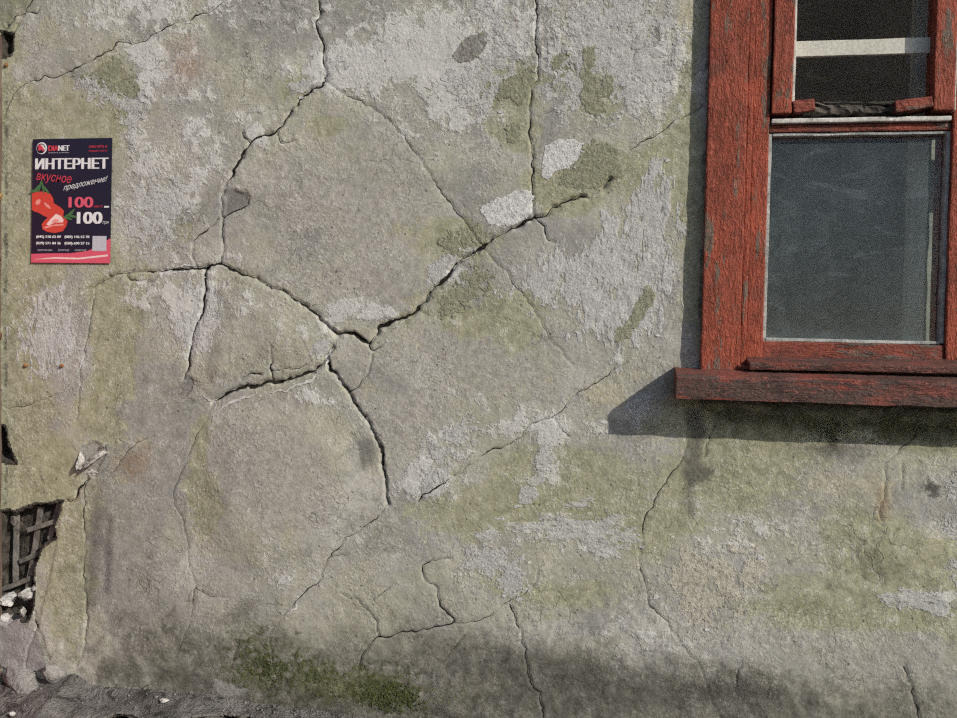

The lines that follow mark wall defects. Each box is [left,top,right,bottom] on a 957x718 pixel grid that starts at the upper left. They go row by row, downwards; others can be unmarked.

crack [4,0,624,688]
flaking render [76,442,108,476]
water stain [758,413,957,453]
flaking render [0,499,65,672]
crack [343,558,544,718]
crack [639,410,723,704]